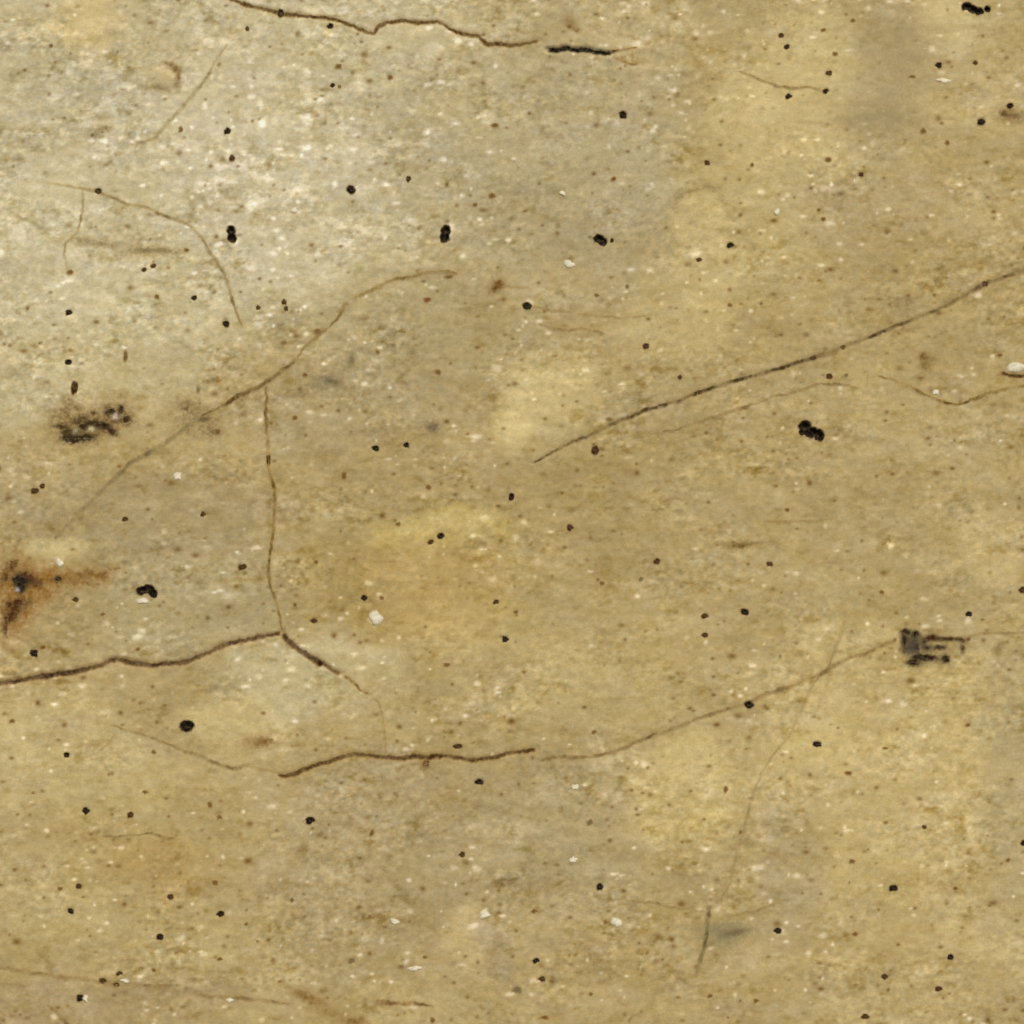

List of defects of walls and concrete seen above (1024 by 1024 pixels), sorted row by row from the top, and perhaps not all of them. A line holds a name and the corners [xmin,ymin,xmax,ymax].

crack [230,0,637,65]
crack [534,269,1024,463]
crack [0,270,457,694]
corrosion [0,559,107,644]
crack [113,725,238,770]
crack [278,638,897,778]